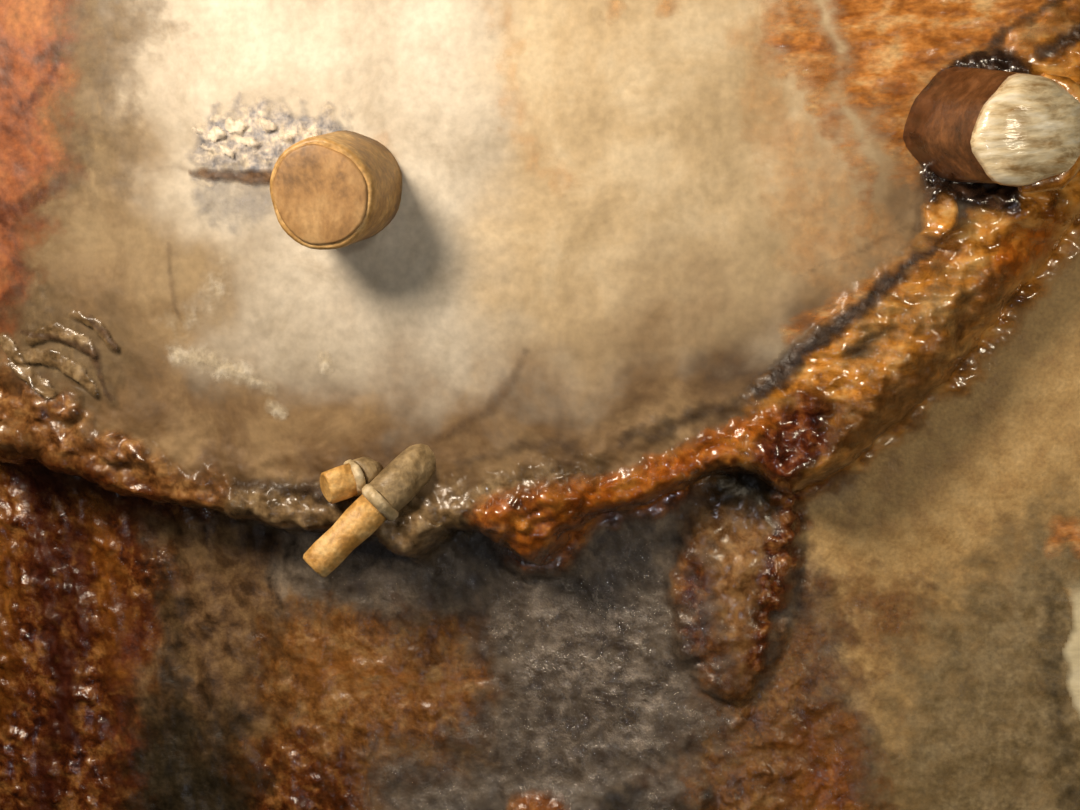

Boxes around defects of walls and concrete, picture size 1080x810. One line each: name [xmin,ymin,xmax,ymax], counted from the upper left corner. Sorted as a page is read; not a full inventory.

rust [0,0,81,335]
spalling [190,98,348,185]
rust [764,0,1080,166]
damp [173,349,259,383]
rust [783,278,879,335]
damp [0,367,356,535]
rust [552,421,769,519]
rust [0,440,212,810]
damp [123,703,256,810]
damp [317,464,730,810]
rust [642,625,893,810]
damp [887,524,1080,810]